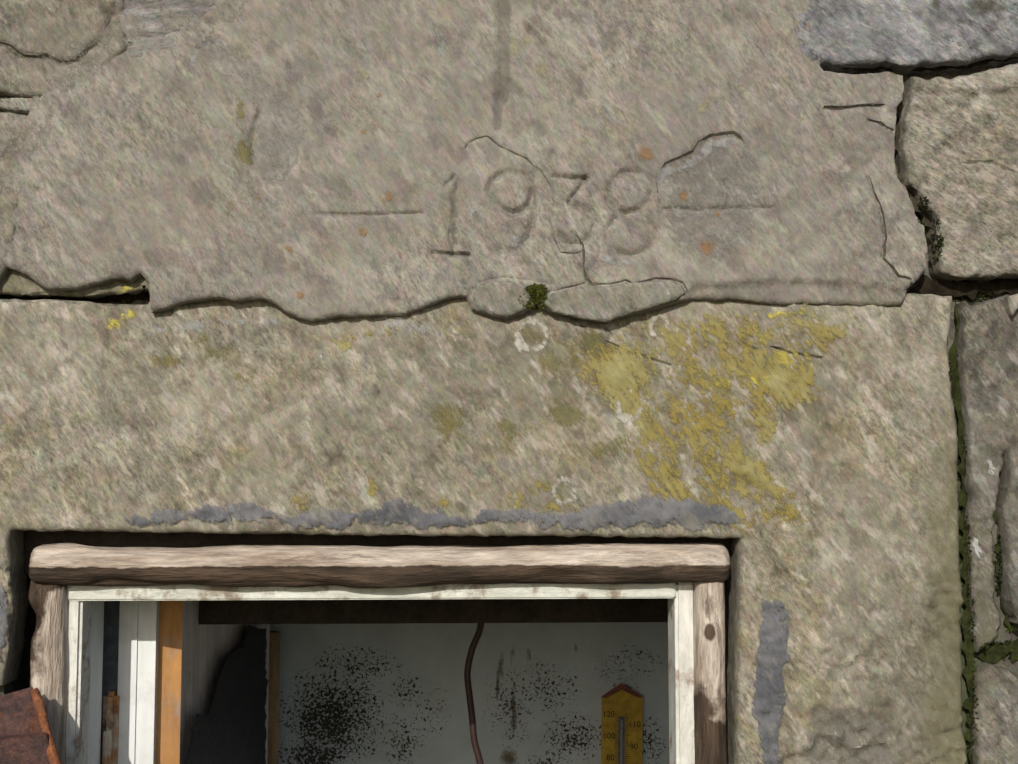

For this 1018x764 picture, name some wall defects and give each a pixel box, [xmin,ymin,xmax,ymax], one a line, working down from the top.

crack [0,42,96,63]
crack [465,135,551,186]
crack [661,131,745,170]
crack [545,233,688,295]
crack [825,57,1018,764]
damp [278,646,448,764]
damp [484,652,602,764]
damp [643,716,666,759]